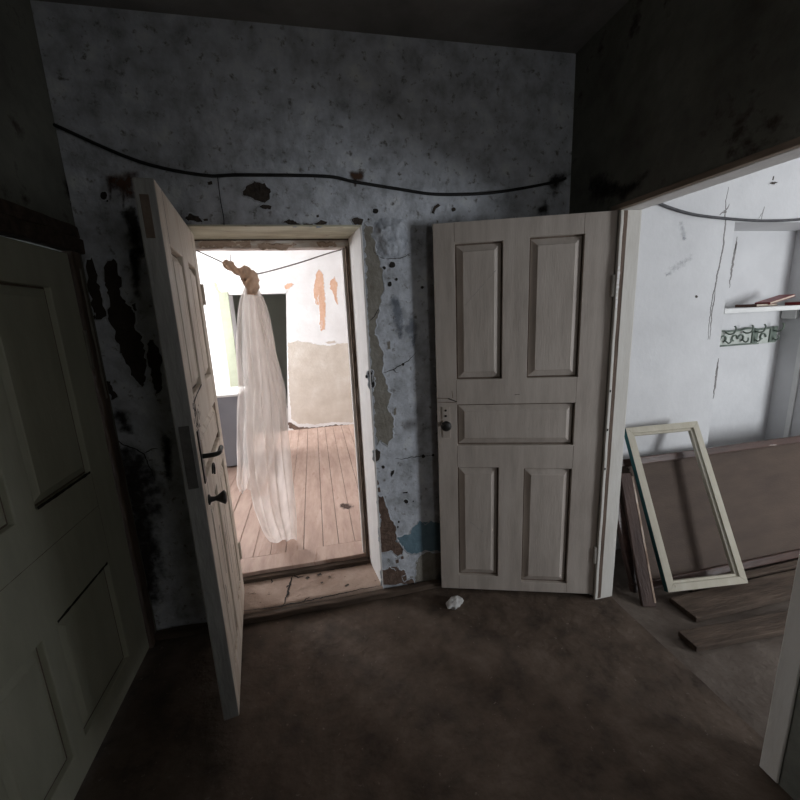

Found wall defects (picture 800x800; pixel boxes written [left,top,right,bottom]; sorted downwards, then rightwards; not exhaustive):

flaking render [242,179,273,211]
peeling [84,255,164,401]
peeling [313,269,338,331]
peeling [350,208,398,477]
crack [708,187,737,338]
flaking render [376,480,441,586]
crack [244,564,376,611]